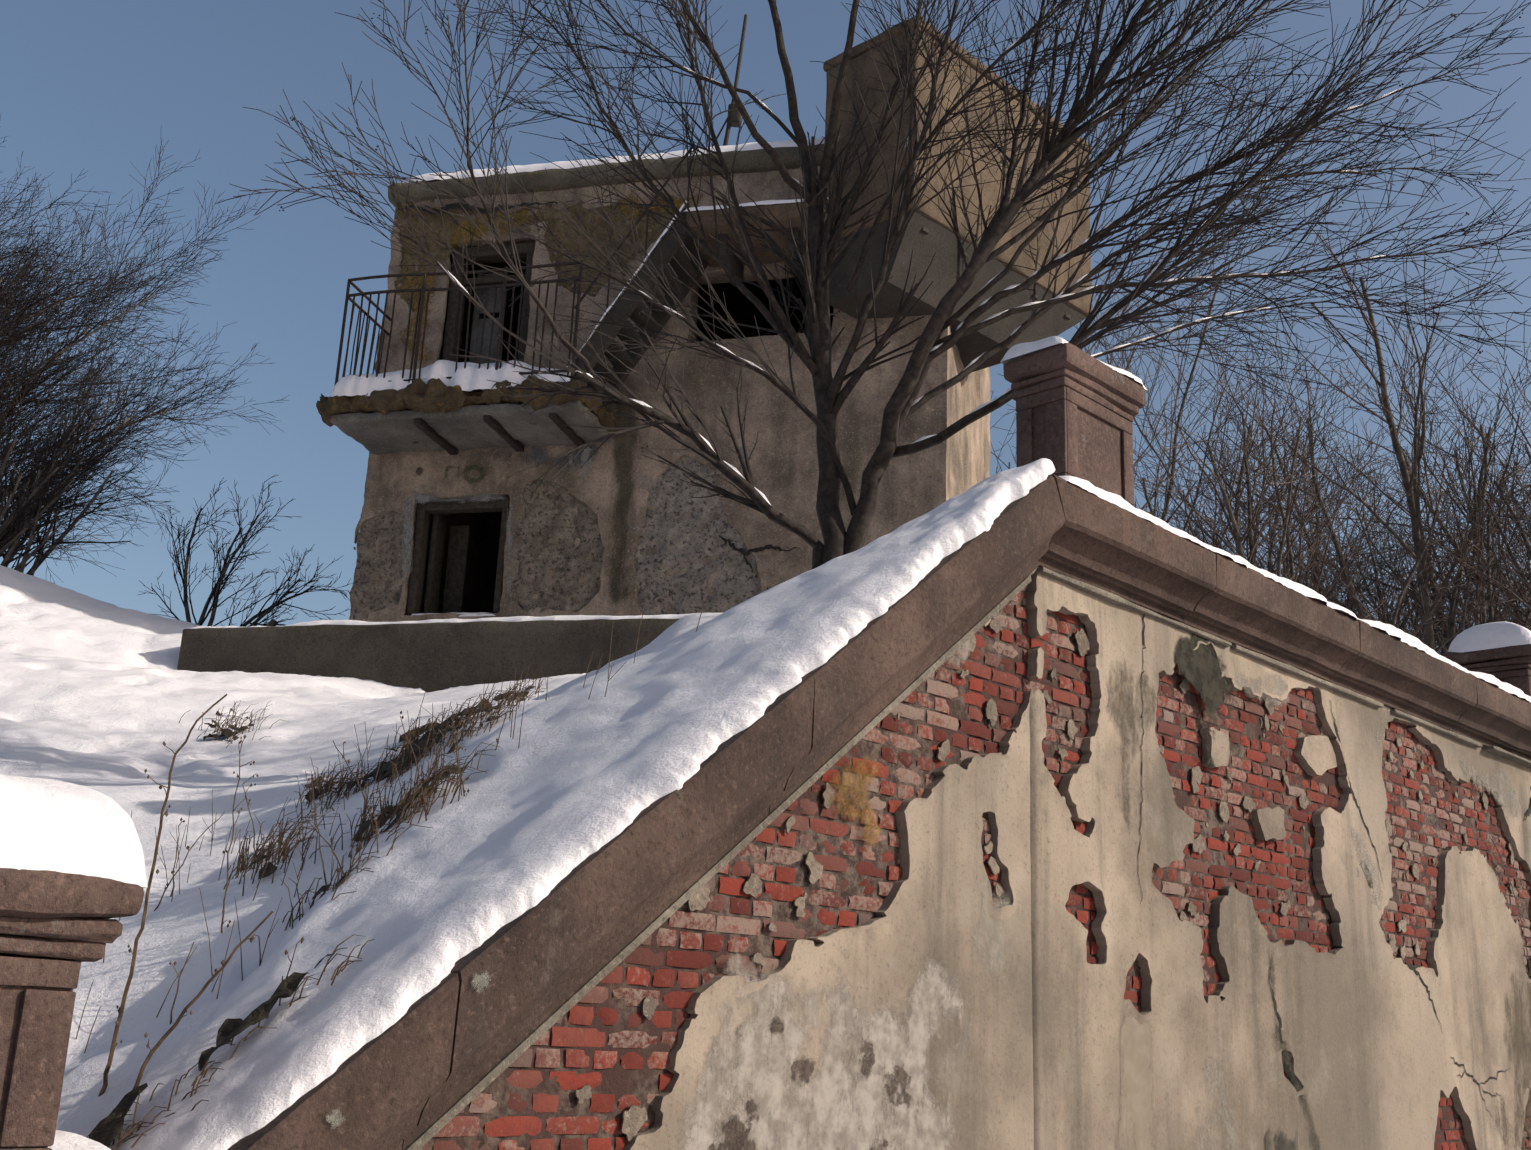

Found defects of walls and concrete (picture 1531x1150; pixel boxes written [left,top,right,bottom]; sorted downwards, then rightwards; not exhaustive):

spalling [505,480,605,616]
spalling [628,448,770,615]
crack [719,535,796,573]
flaking render [419,586,1092,1150]
flaking render [1065,884,1099,964]
flaking render [1124,959,1142,1012]
flaking render [1152,653,1343,995]
crack [1269,956,1287,1050]
flaking render [1379,721,1531,973]
crack [1403,958,1509,1117]
crack [1488,831,1531,975]
flaking render [1434,1096,1470,1150]